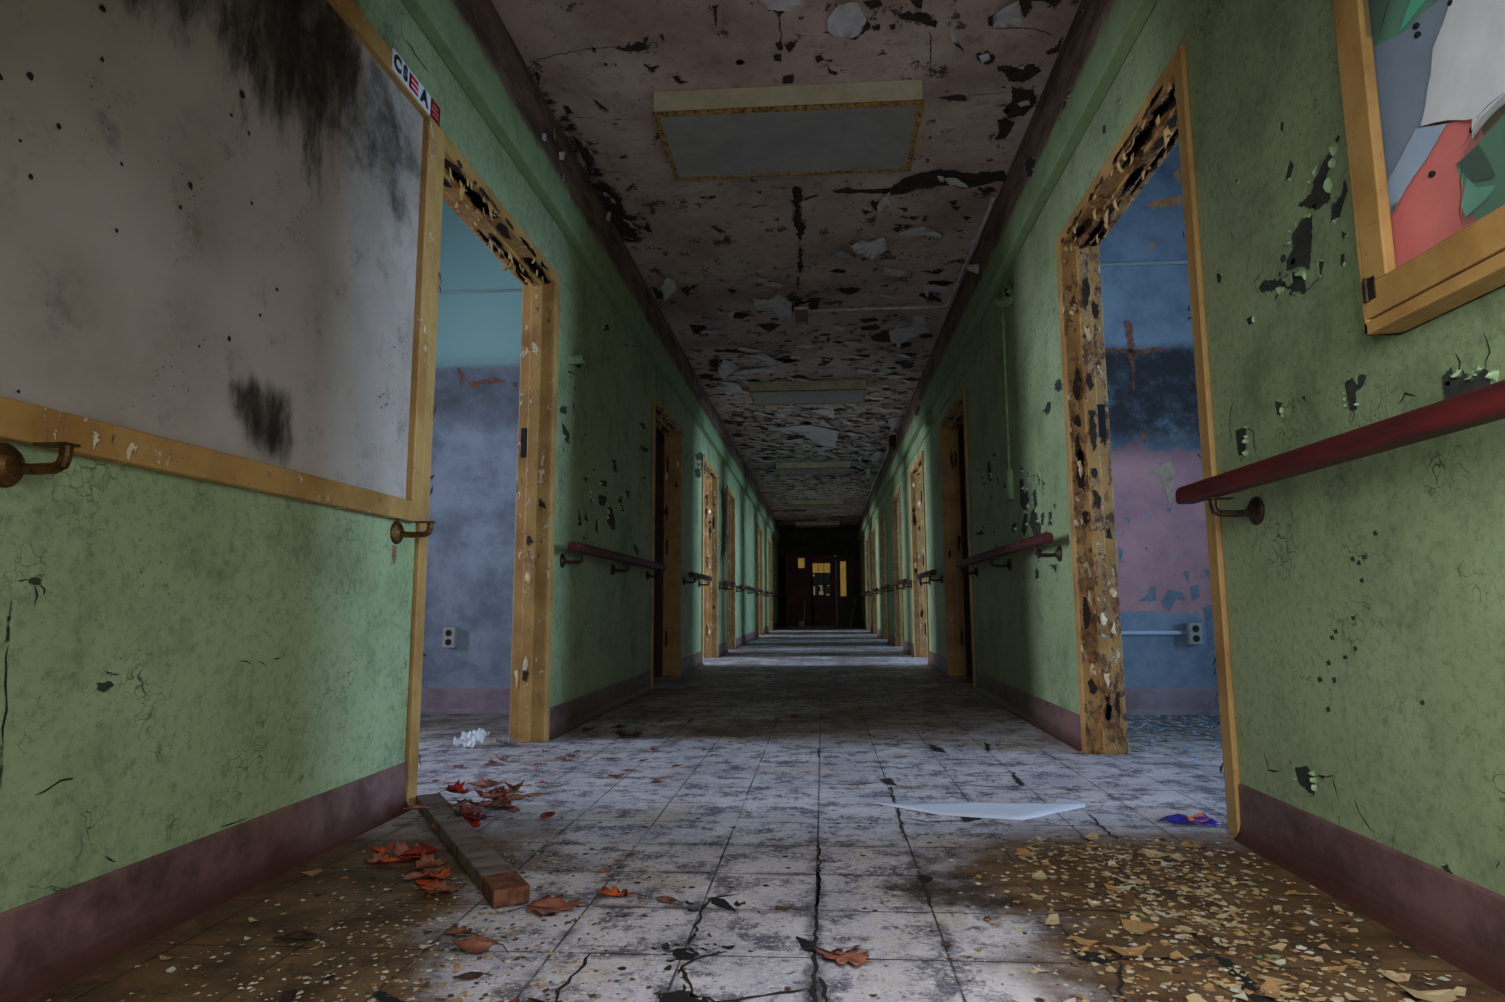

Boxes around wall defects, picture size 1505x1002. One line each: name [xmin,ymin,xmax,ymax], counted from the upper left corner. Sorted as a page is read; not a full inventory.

water stain [222,0,359,163]
water stain [371,88,415,211]
peeling [443,158,571,295]
peeling [823,0,1064,141]
peeling [1061,82,1183,251]
peeling [1247,135,1349,302]
peeling [650,169,1007,504]
water stain [237,380,291,455]
crack [810,841,828,1002]
crack [889,786,907,841]
crack [918,874,934,908]
crack [1088,814,1118,839]